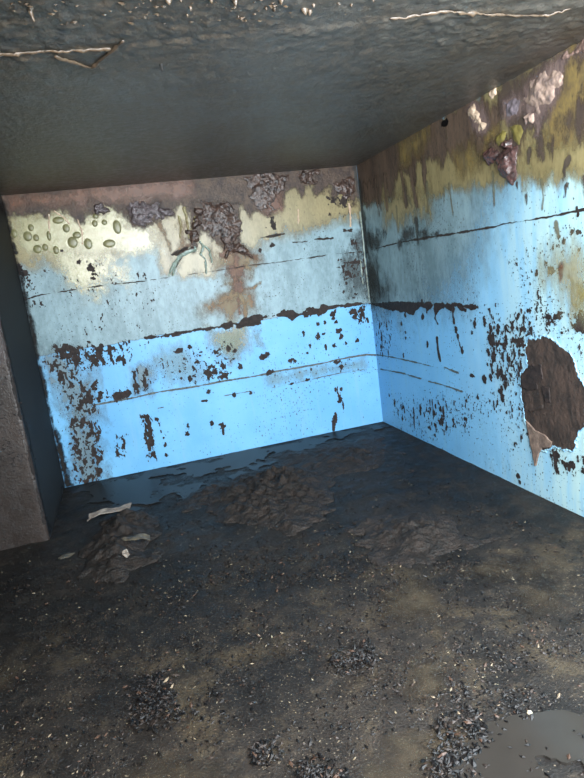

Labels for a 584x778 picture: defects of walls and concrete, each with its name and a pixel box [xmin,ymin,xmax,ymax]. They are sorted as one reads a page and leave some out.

peeling [17,263,46,310]
peeling [42,259,243,484]
rust [157,222,188,251]
rust [203,249,261,354]
damp [3,39,584,487]
peeling [389,225,584,477]